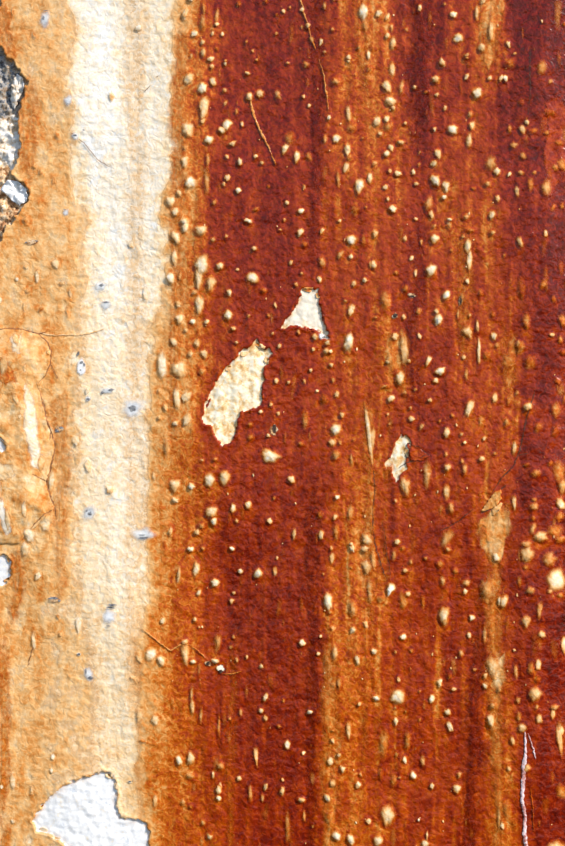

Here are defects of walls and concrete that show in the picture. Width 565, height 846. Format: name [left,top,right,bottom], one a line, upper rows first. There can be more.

spalling [0,47,29,242]
corrosion [0,0,96,846]
crack [0,328,103,538]
peeling [202,339,273,446]
peeling [281,287,329,339]
corrosion [131,0,565,846]
peeling [384,434,430,482]
peeling [32,771,150,846]